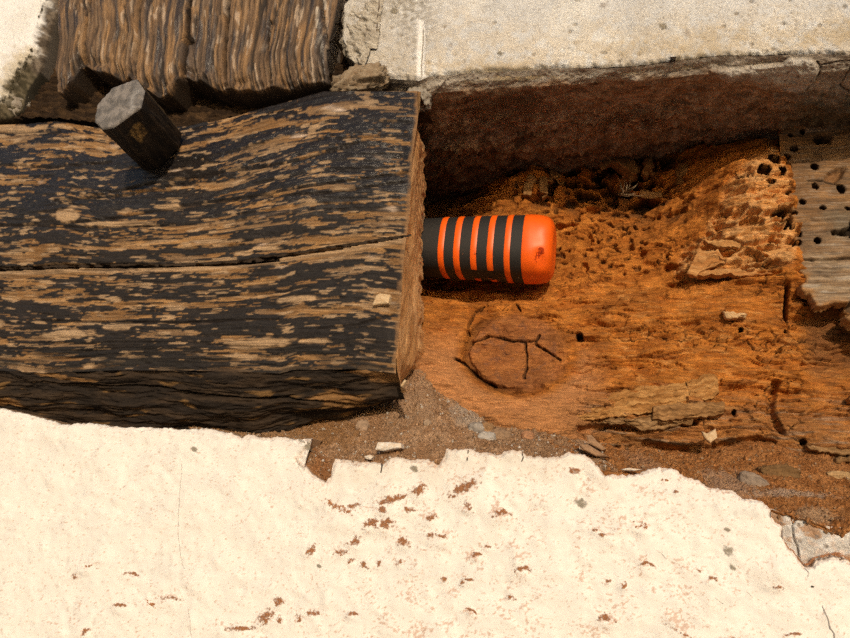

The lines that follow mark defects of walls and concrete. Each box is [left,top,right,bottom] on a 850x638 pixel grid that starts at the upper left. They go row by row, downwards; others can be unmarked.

spalling [770,508,850,566]